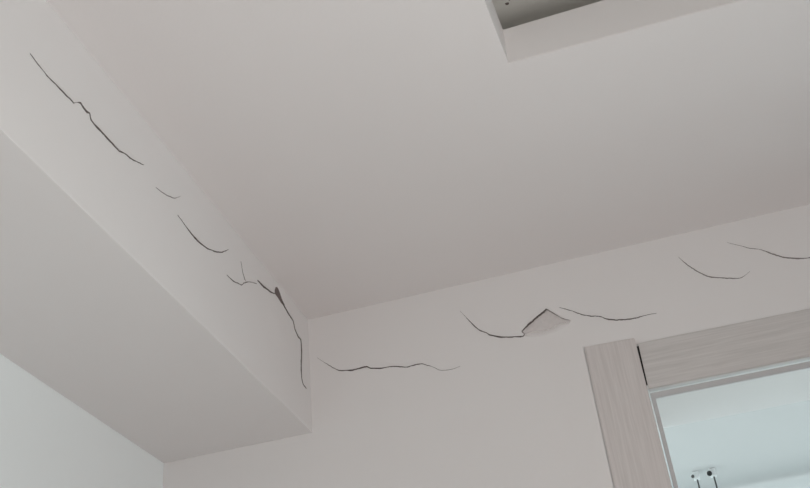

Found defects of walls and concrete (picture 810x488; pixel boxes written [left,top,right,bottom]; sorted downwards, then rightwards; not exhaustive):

crack [30,52,143,165]
crack [156,186,228,253]
crack [727,241,810,259]
crack [679,256,750,279]
crack [227,263,460,389]
peeling [460,307,571,338]
crack [559,306,656,321]